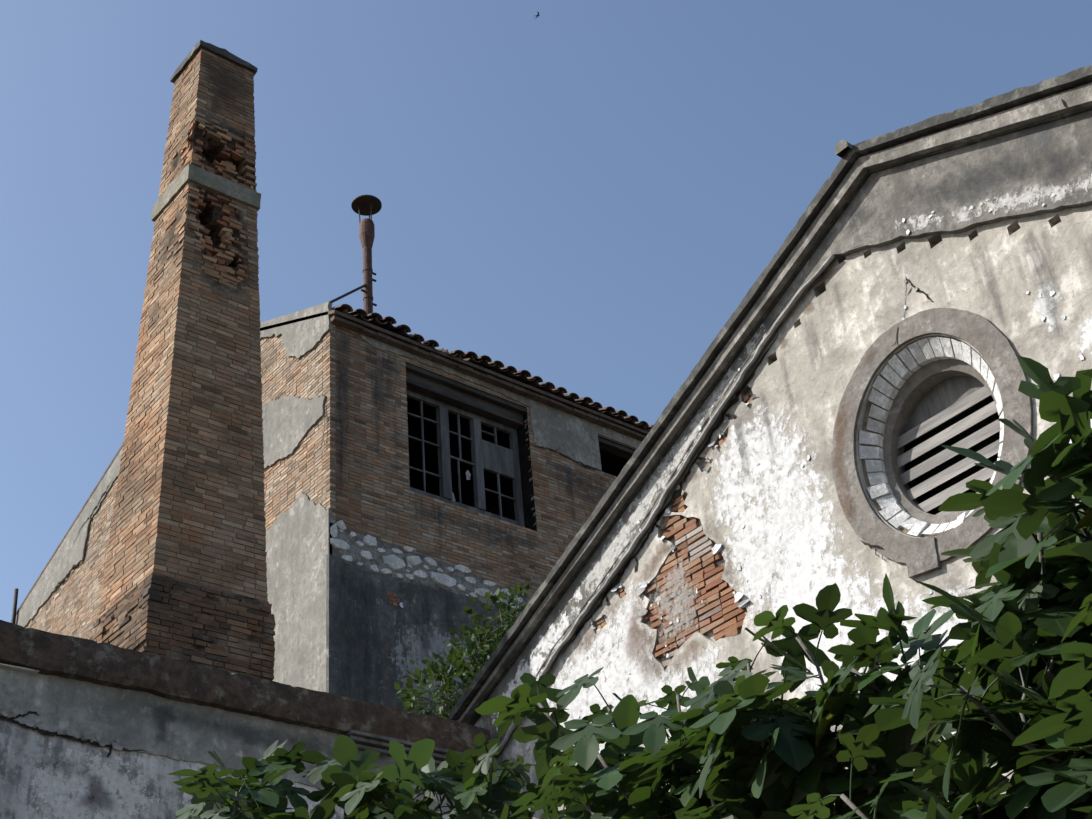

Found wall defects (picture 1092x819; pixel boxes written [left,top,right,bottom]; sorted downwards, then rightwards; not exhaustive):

peeling [895,174,1092,235]
crack [892,277,934,346]
peeling [496,323,983,731]
crack [0,709,147,757]